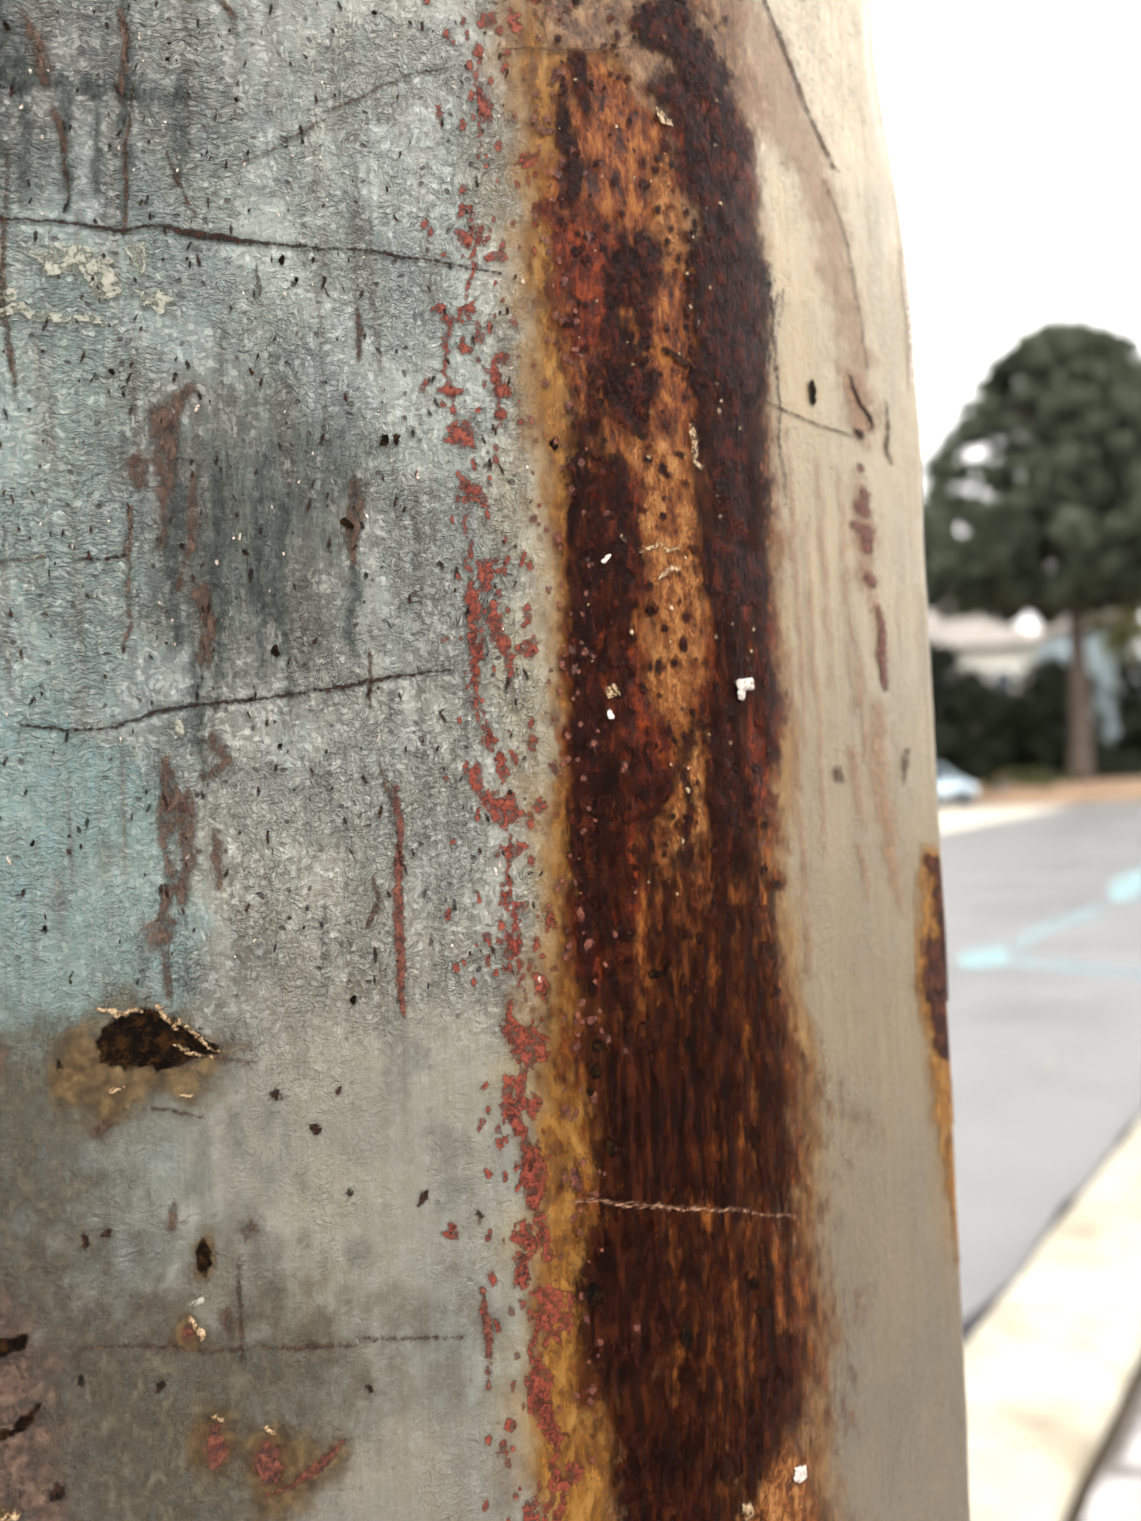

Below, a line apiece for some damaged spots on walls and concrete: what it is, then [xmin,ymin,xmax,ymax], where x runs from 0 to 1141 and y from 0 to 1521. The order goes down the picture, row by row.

crack [0,83,502,295]
peeling [435,0,541,159]
peeling [430,225,509,449]
water stain [127,453,149,489]
crack [20,650,454,733]
water stain [250,469,292,698]
water stain [343,500,362,657]
peeling [456,470,555,1004]
rust [501,0,853,1521]
rust [851,463,889,692]
rust [915,847,960,1262]
peeling [496,1019,584,1521]